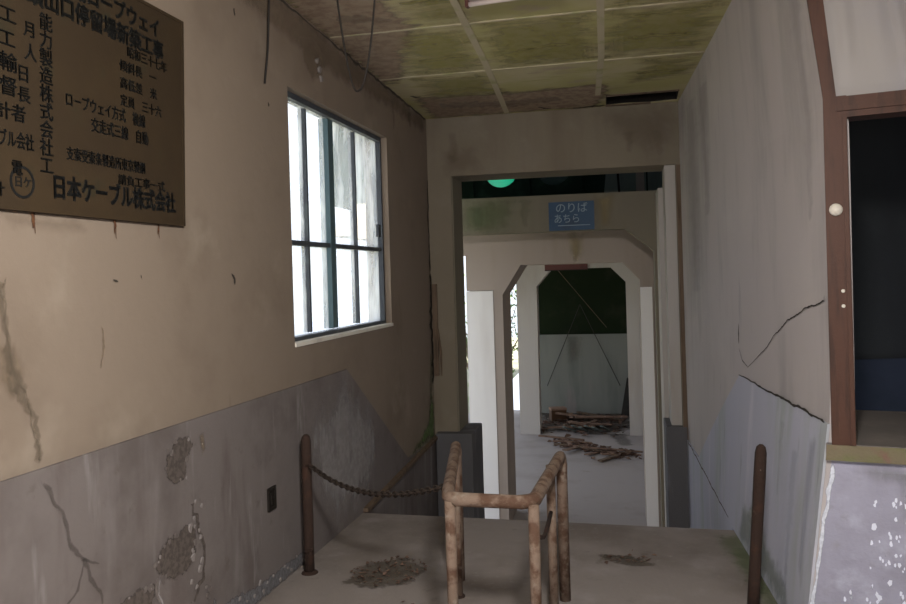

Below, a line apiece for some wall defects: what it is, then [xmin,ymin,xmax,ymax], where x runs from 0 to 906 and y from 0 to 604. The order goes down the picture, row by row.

water stain [288,0,440,84]
water stain [418,84,607,118]
crack [4,349,20,393]
crack [739,300,824,423]
spalling [164,437,193,484]
spalling [119,499,216,604]
water stain [810,465,835,604]